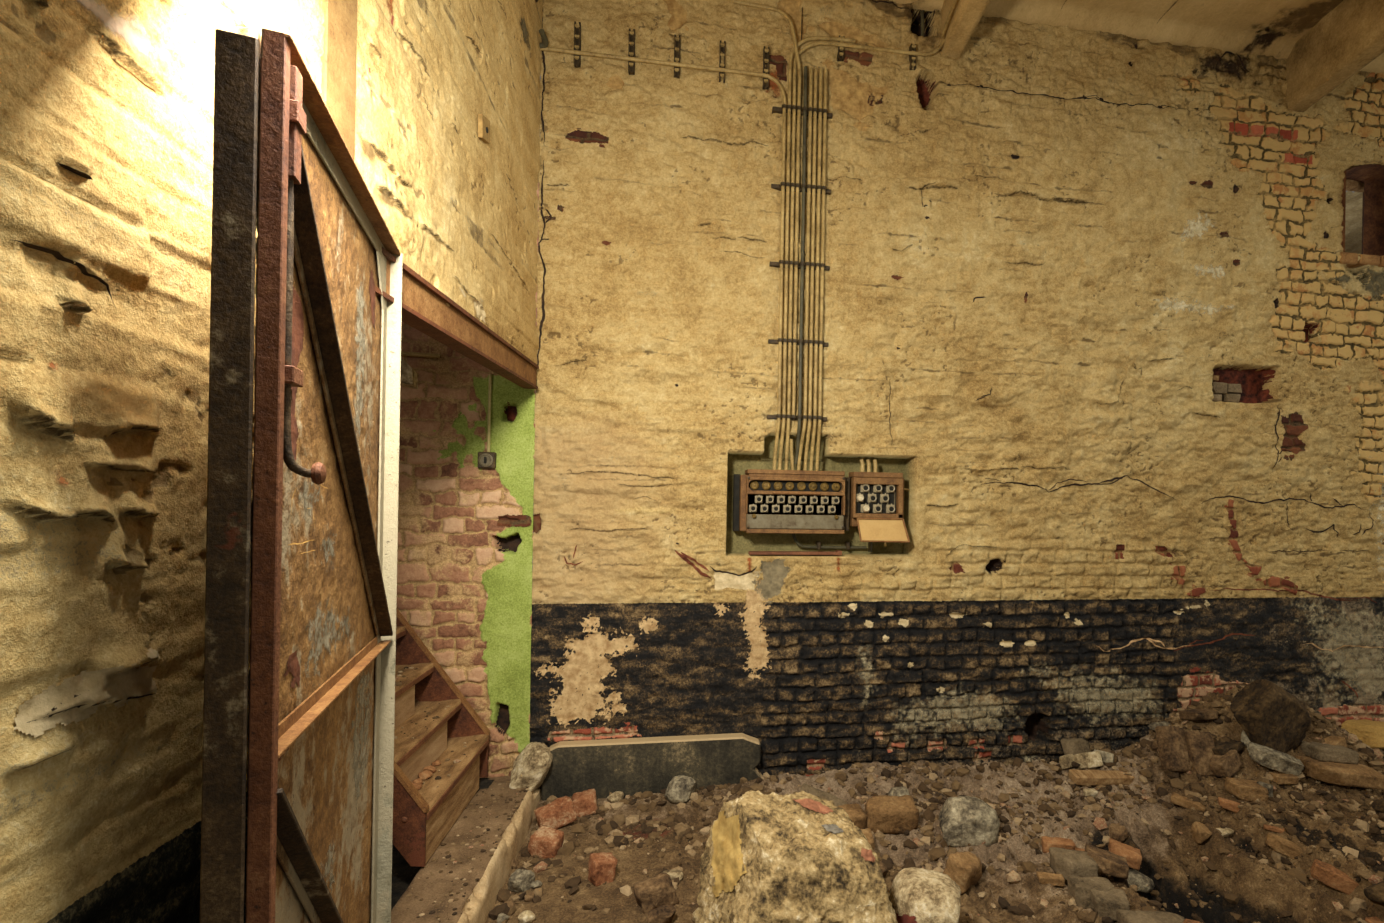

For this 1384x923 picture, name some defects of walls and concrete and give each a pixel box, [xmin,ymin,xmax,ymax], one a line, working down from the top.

damp [1193,0,1343,85]
flaking render [1178,72,1384,507]
spalling [504,401,517,422]
crack [965,407,1374,552]
flaking render [495,513,542,552]
spalling [1224,499,1298,595]
peeling [14,647,160,738]
spalling [495,703,510,736]
peeling [534,613,659,742]